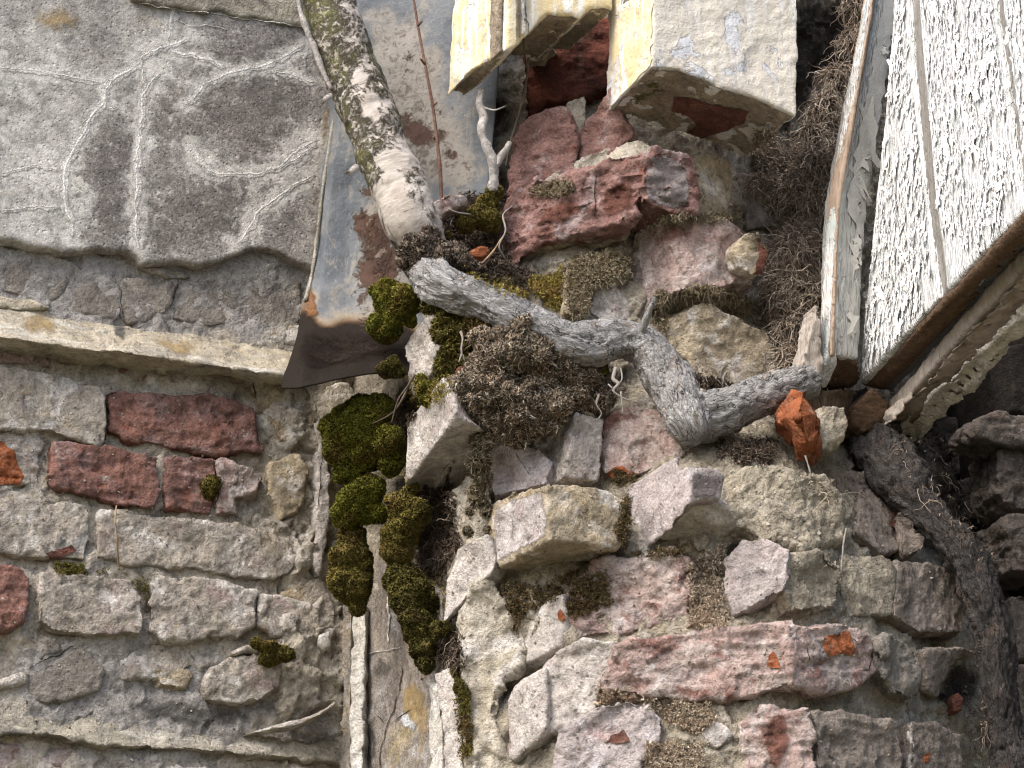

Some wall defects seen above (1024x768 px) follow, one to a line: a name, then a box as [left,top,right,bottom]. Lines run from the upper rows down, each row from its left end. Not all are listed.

crack [0,3,319,249]
rust [304,272,318,316]
rust [356,207,396,279]
peeling [846,0,1024,374]